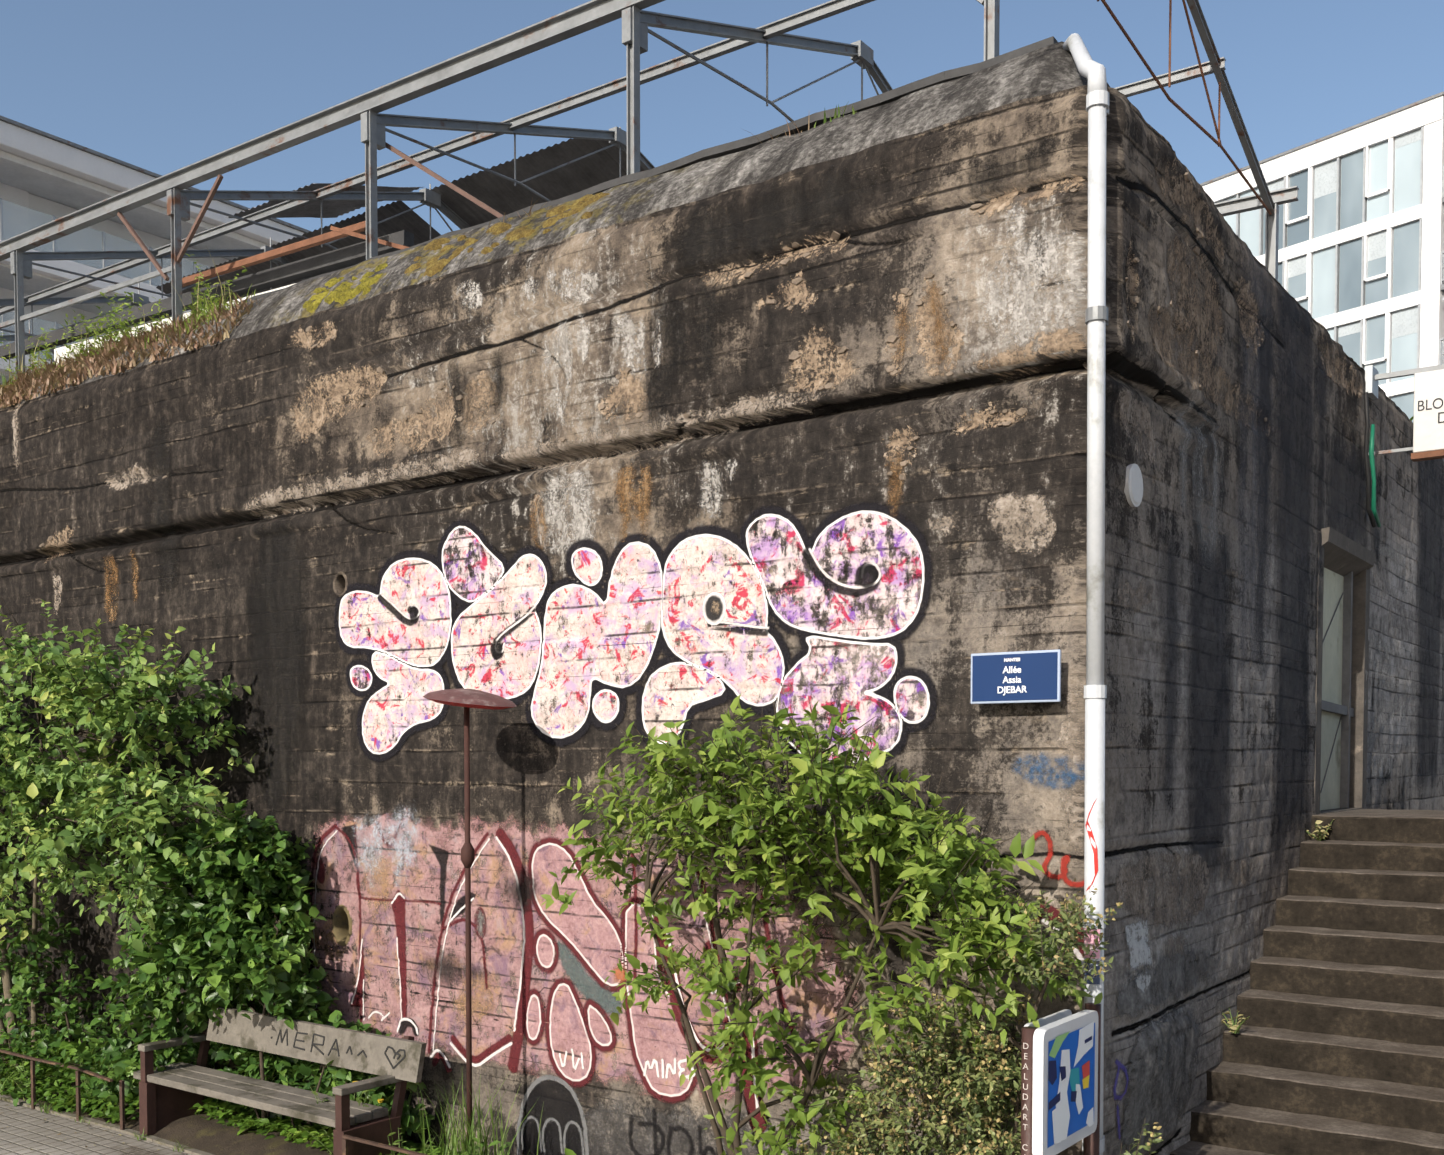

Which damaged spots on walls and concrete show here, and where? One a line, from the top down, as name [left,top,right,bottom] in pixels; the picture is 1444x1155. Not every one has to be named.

leakage [613,169,865,426]
crack [321,176,1284,399]
leakage [968,140,1086,383]
crack [0,351,1217,574]
crack [766,570,850,588]
leakage [1163,252,1444,877]